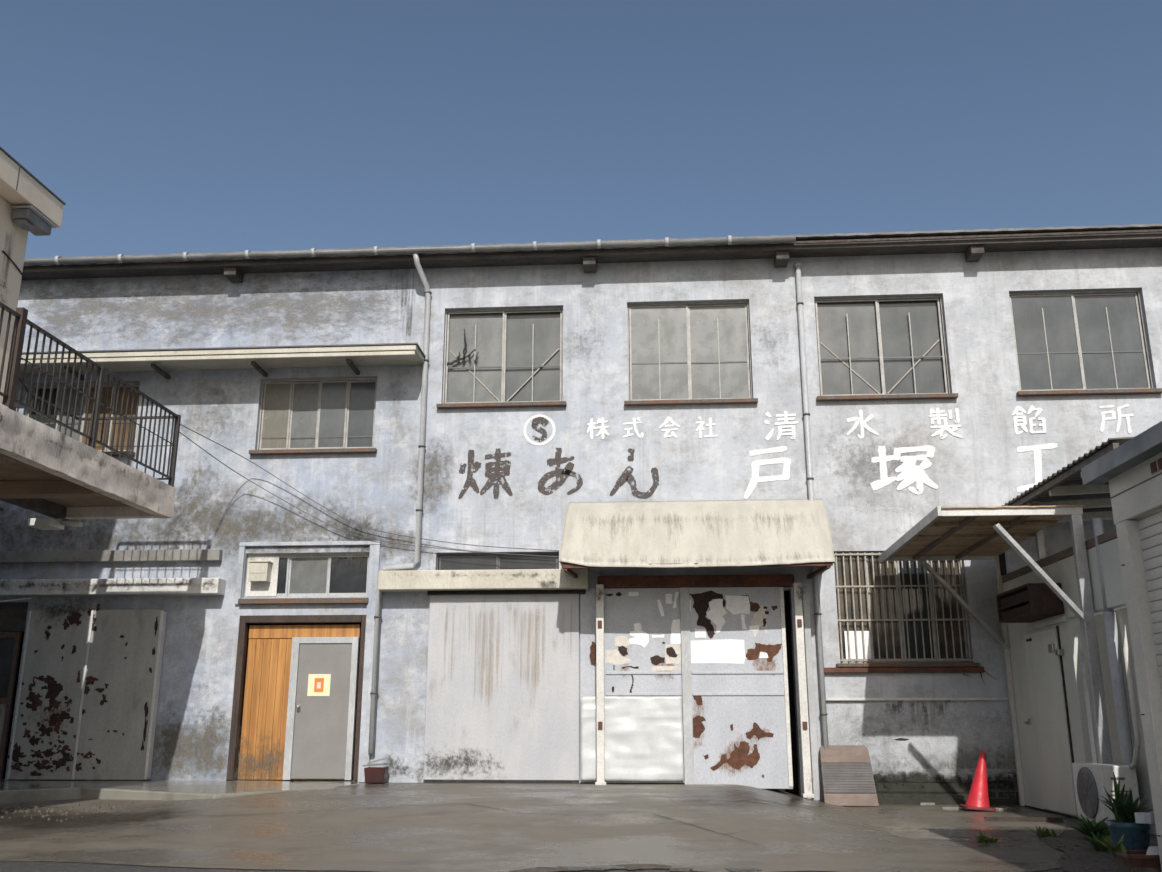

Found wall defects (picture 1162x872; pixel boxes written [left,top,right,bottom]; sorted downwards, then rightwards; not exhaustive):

leakage [0,470,424,553]
rust [34,603,100,653]
peeling [605,592,768,671]
rust [689,590,726,639]
rust [742,595,778,627]
rust [746,643,782,671]
rust [7,665,109,777]
leakage [153,716,226,776]
leakage [389,751,489,775]
rust [693,696,774,777]
leakage [922,752,1016,776]